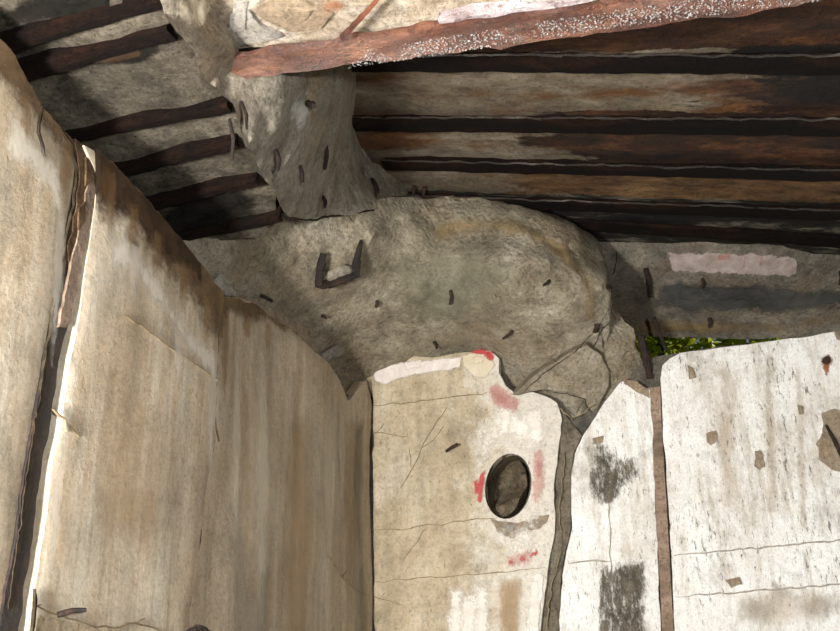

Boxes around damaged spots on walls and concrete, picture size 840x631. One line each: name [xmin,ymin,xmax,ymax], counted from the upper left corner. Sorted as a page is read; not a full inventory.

spalling [65,139,95,263]
damp [93,147,298,375]
spalling [160,0,654,419]
crack [8,107,79,608]
crack [212,331,220,451]
damp [590,444,638,503]
spalling [816,409,840,472]
crack [29,589,162,631]
damp [599,564,645,631]